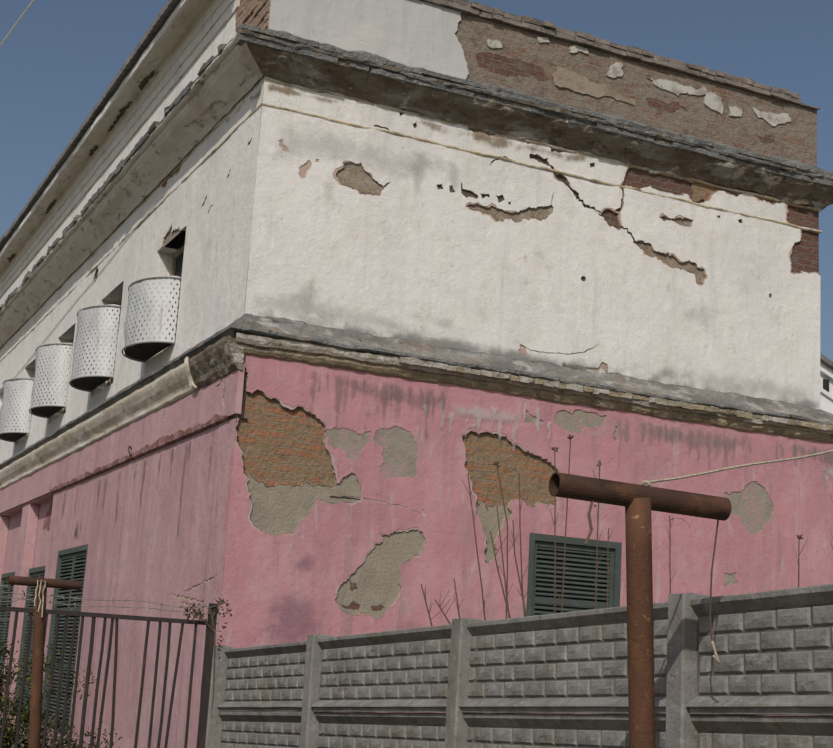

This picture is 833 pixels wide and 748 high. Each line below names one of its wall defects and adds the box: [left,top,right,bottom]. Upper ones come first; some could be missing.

flaking render [647,77,742,117]
flaking render [333,161,390,196]
flaking render [437,185,552,223]
crack [529,154,594,209]
flaking render [659,213,693,227]
flaking render [620,166,742,203]
flaking render [752,192,820,275]
flaking render [633,240,707,286]
flaking render [43,371,425,536]
flaking render [461,429,560,563]
flaking render [725,481,774,534]
flaking render [335,527,425,619]